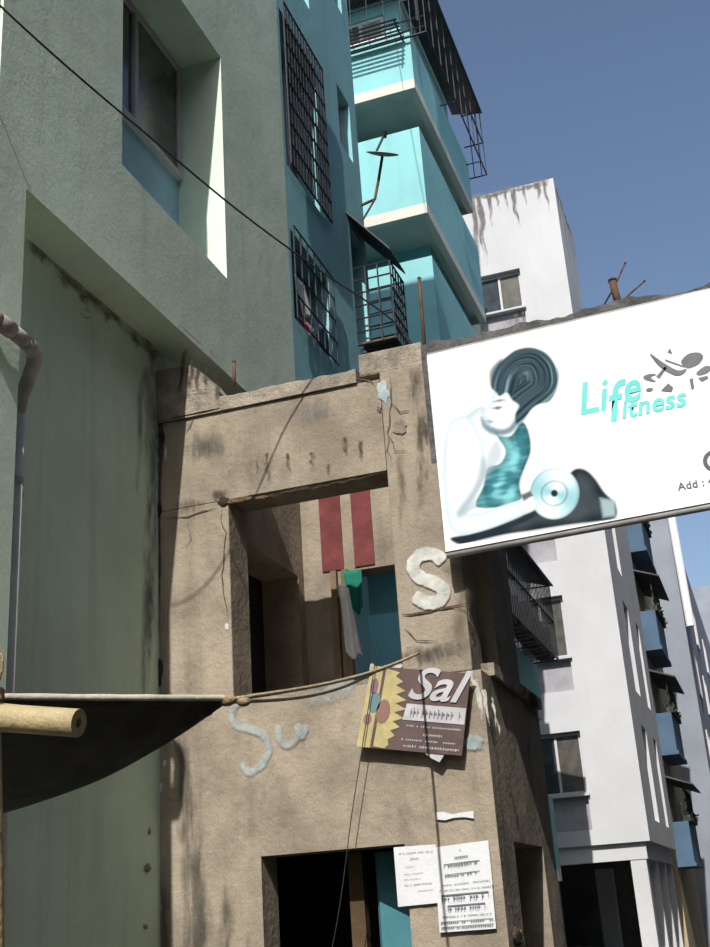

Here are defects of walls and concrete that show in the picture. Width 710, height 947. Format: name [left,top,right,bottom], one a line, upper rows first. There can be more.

leakage [472,179,576,258]
leakage [32,244,119,319]
crack [172,507,217,545]
leakage [194,902,205,947]